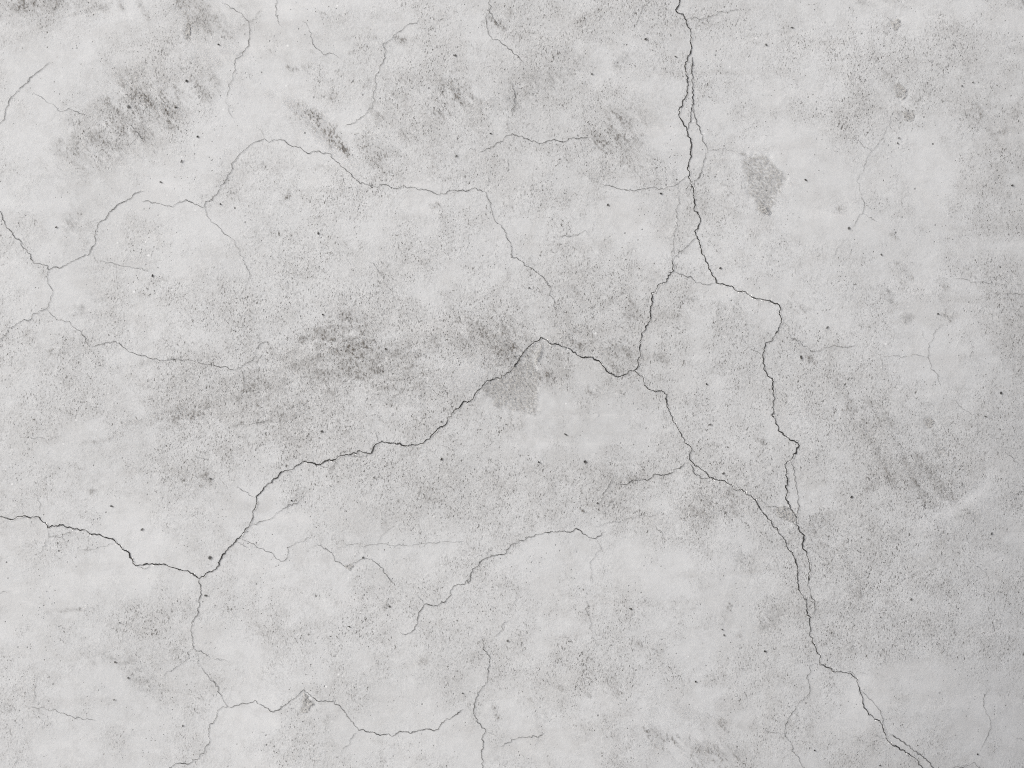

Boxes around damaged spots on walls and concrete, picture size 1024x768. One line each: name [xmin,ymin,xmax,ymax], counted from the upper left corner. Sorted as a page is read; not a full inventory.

crack [0,194,134,289]
crack [0,241,933,768]
crack [675,0,811,583]